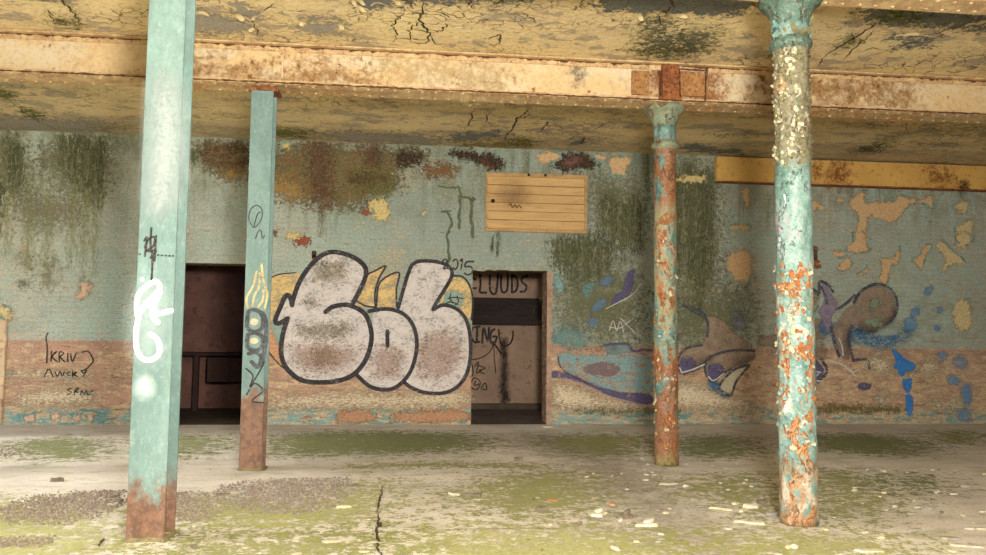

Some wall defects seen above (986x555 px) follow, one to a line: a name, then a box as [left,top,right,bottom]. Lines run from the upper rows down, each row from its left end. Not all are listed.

peeling [195,1,266,38]
crack [390,0,536,46]
crack [467,108,550,139]
peeling [770,10,814,167]
damp [0,112,122,289]
damp [274,126,514,264]
damp [550,192,646,291]
peeling [812,190,976,285]
peeling [951,297,973,332]
crack [375,486,383,555]